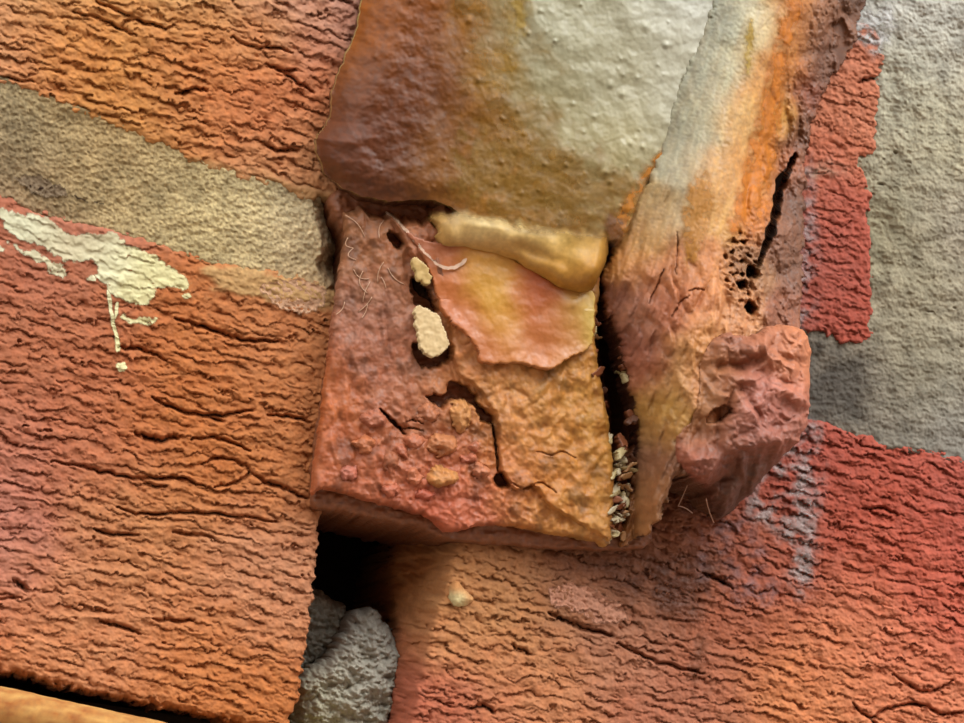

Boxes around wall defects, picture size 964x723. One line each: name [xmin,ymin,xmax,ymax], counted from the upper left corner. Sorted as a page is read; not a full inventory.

corrosion [316,0,662,239]
corrosion [729,0,802,233]
corrosion [682,171,714,262]
crack [756,155,796,265]
peeling [385,211,611,371]
peeling [591,356,629,384]
peeling [603,409,639,544]